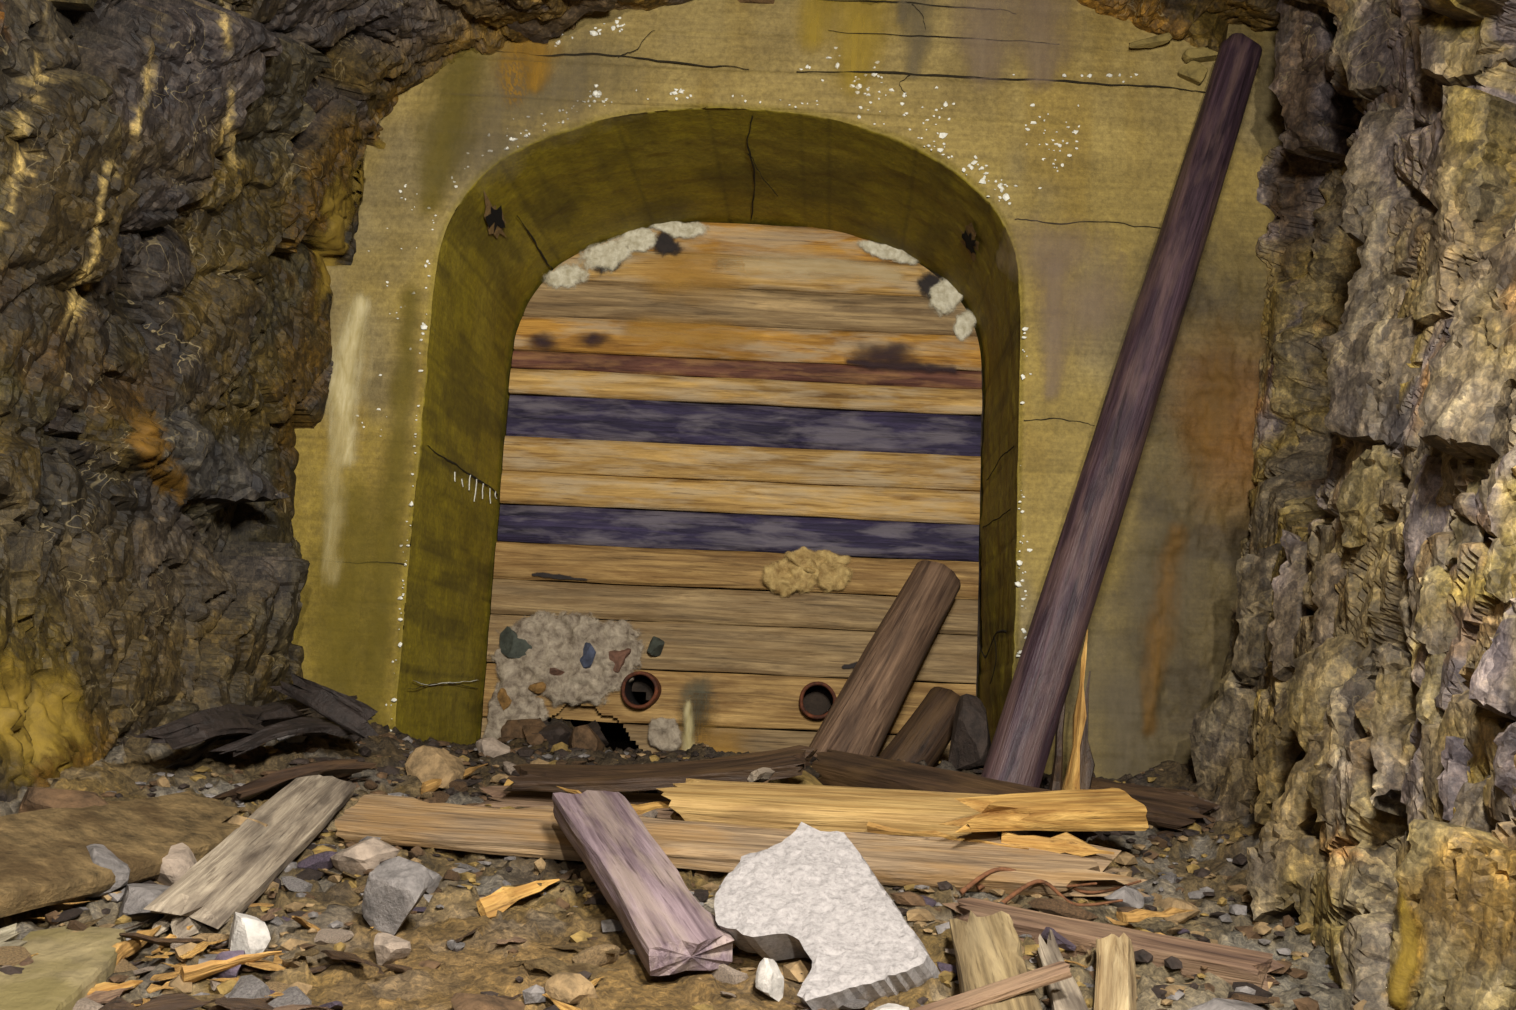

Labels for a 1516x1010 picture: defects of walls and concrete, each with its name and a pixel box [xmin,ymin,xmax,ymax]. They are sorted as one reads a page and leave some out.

crack [496,30,749,70]
crack [796,0,1206,96]
damp [1030,0,1138,83]
damp [800,0,1017,205]
damp [1025,103,1080,172]